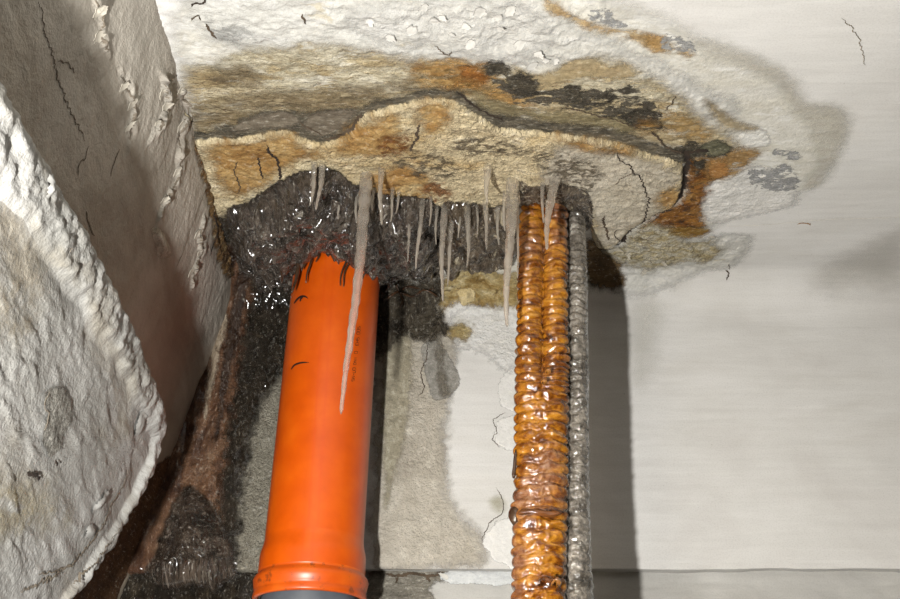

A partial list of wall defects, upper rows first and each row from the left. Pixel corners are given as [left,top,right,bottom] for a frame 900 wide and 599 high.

crack [38,1,88,175]
rust [412,58,535,107]
peeling [660,34,697,54]
crack [233,146,282,194]
flaking render [195,98,720,270]
crack [564,107,710,250]
rust [640,147,761,240]
leakage [73,167,519,599]